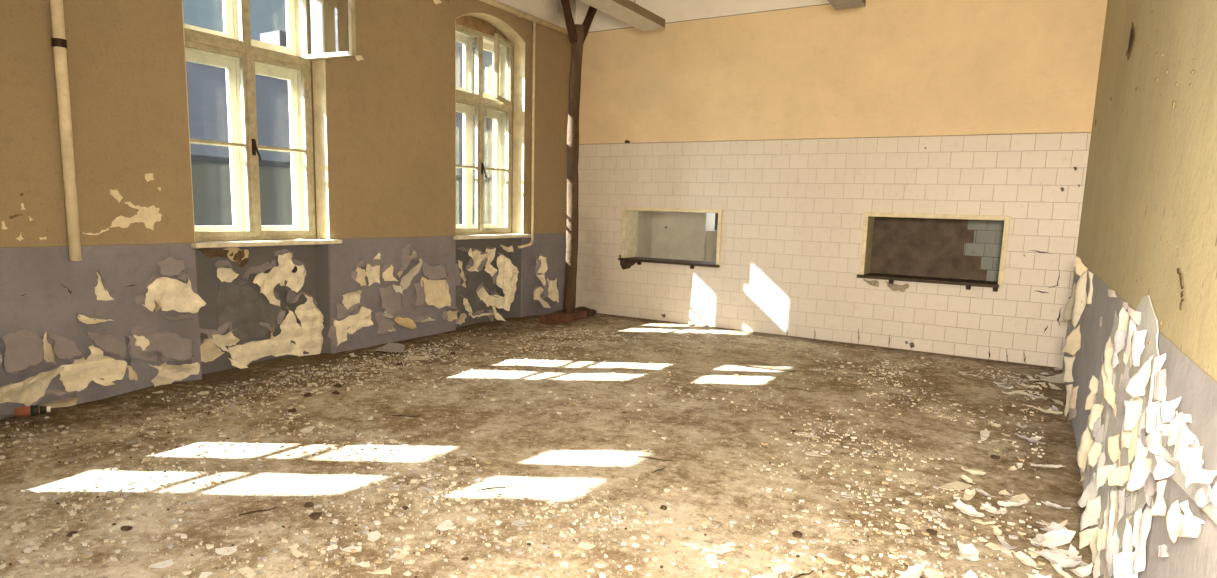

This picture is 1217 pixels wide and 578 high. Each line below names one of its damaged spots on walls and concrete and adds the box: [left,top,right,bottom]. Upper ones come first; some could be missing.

peeling [82,189,163,235]
peeling [0,243,519,420]
peeling [532,253,559,308]
flaking render [1061,255,1217,578]